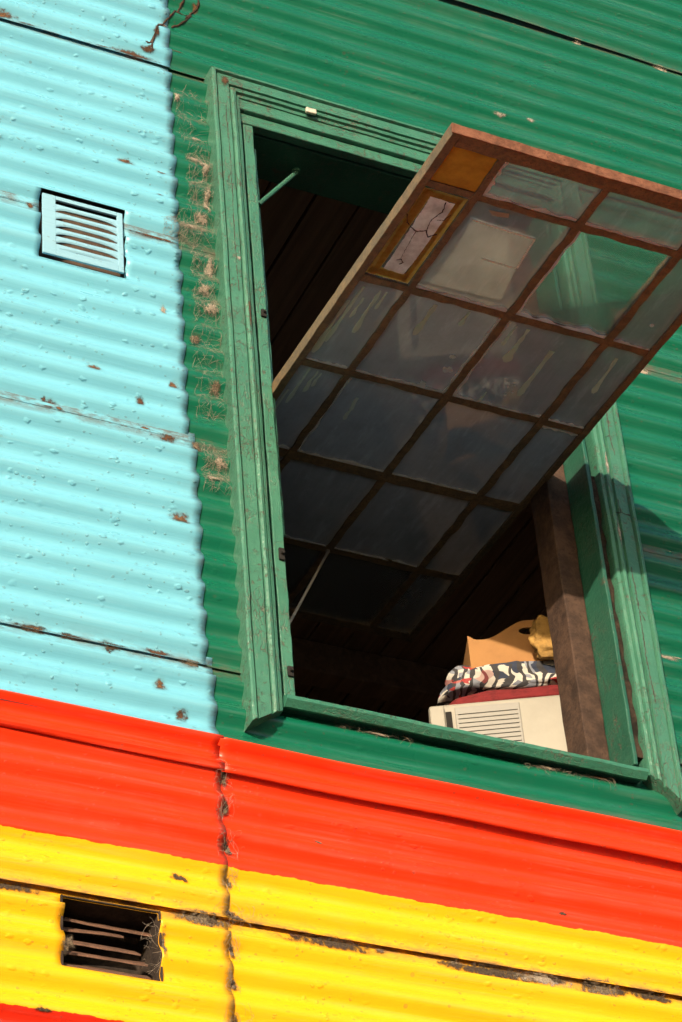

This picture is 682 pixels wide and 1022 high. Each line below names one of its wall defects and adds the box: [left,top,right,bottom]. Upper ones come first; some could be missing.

crack [141,0,200,53]